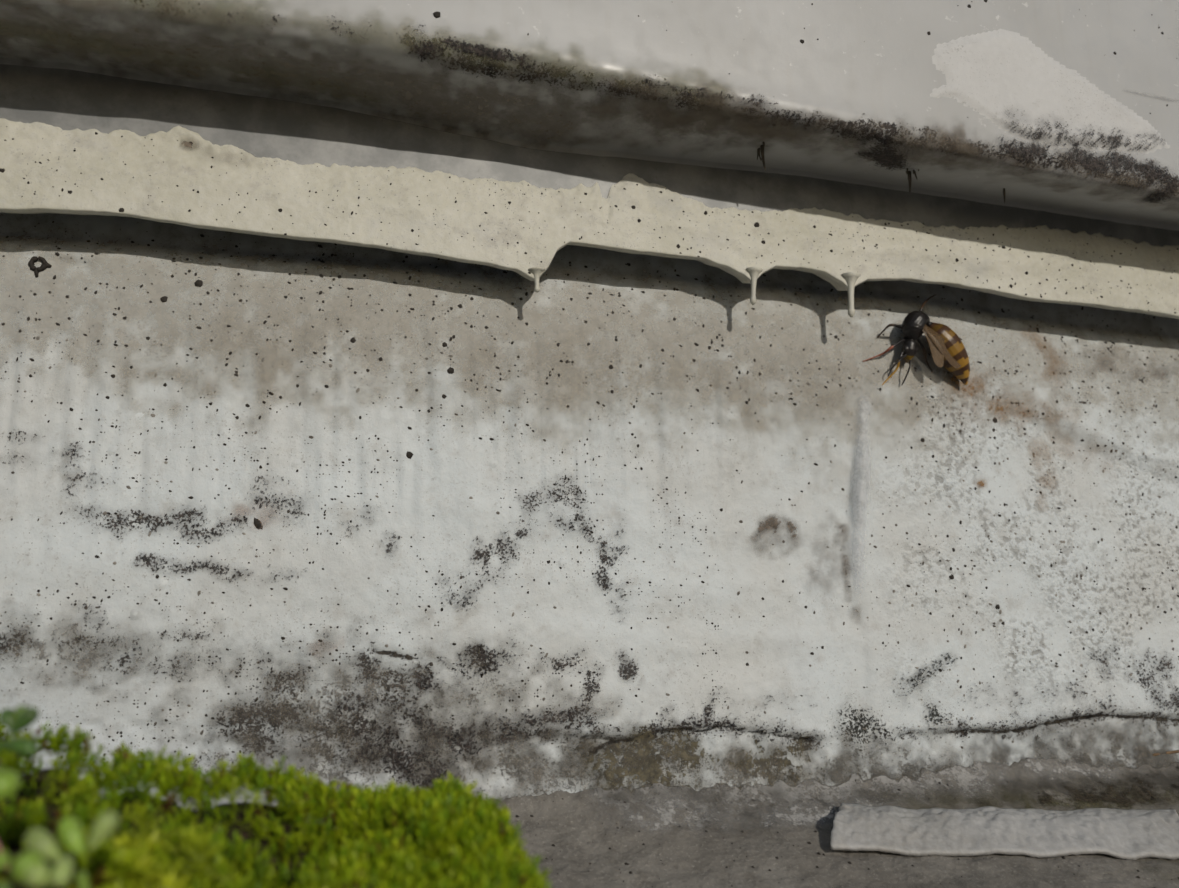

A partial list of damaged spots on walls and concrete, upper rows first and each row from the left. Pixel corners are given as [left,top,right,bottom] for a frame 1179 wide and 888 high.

leakage [0,7,1179,203]
leakage [0,211,1179,788]
crack [472,725,813,754]
crack [906,712,1179,734]